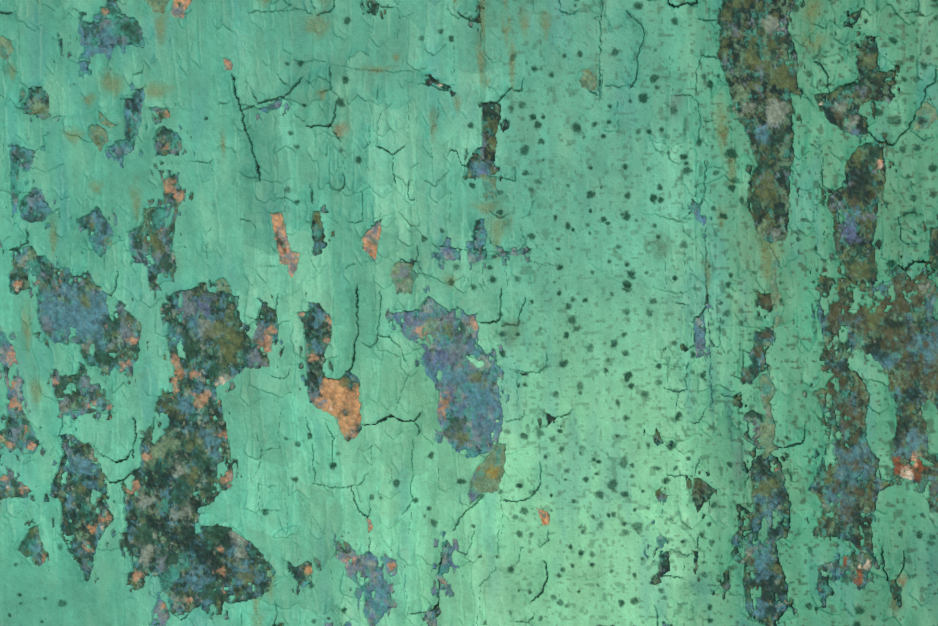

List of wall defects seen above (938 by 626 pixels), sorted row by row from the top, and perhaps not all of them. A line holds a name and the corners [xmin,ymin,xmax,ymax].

peeling [360,0,389,20]
crack [868,61,938,146]
peeling [0,82,405,626]
crack [189,46,483,551]
peeling [385,219,533,505]
crack [478,166,560,327]
crack [558,0,758,488]
peeling [709,0,938,626]
crack [93,416,155,484]
crack [404,462,550,626]
peeling [643,520,671,585]
peeling [685,471,721,519]